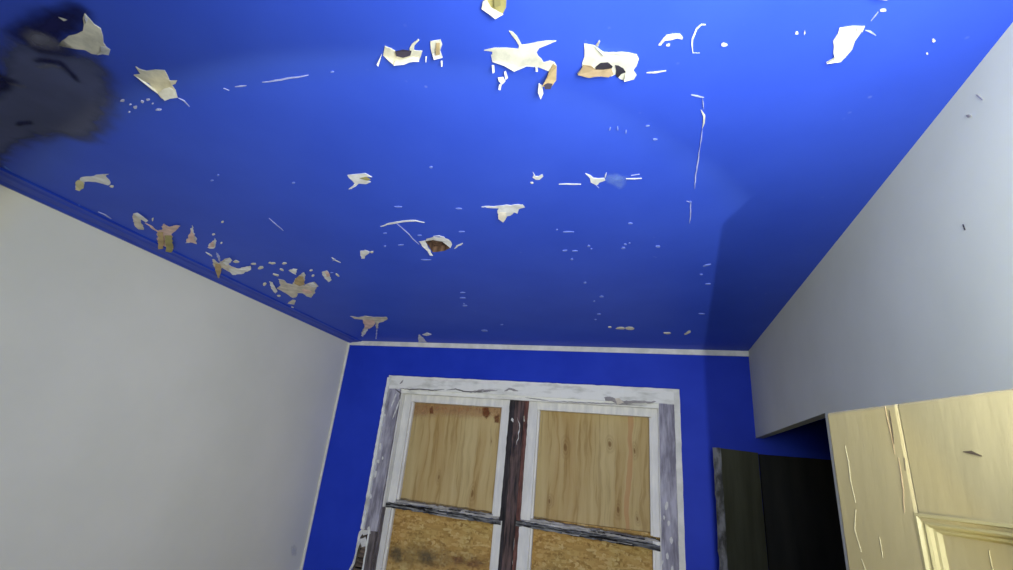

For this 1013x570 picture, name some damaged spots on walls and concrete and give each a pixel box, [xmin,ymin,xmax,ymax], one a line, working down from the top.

peeling [481,0,506,19]
damp [0,5,113,154]
peeling [59,14,110,55]
peeling [120,67,190,113]
peeling [377,39,443,67]
peeling [484,31,557,99]
peeling [577,40,639,82]
peeling [826,9,886,64]
peeling [347,173,372,189]
peeling [482,204,525,222]
peeling [132,213,339,308]
flaking render [417,231,465,261]